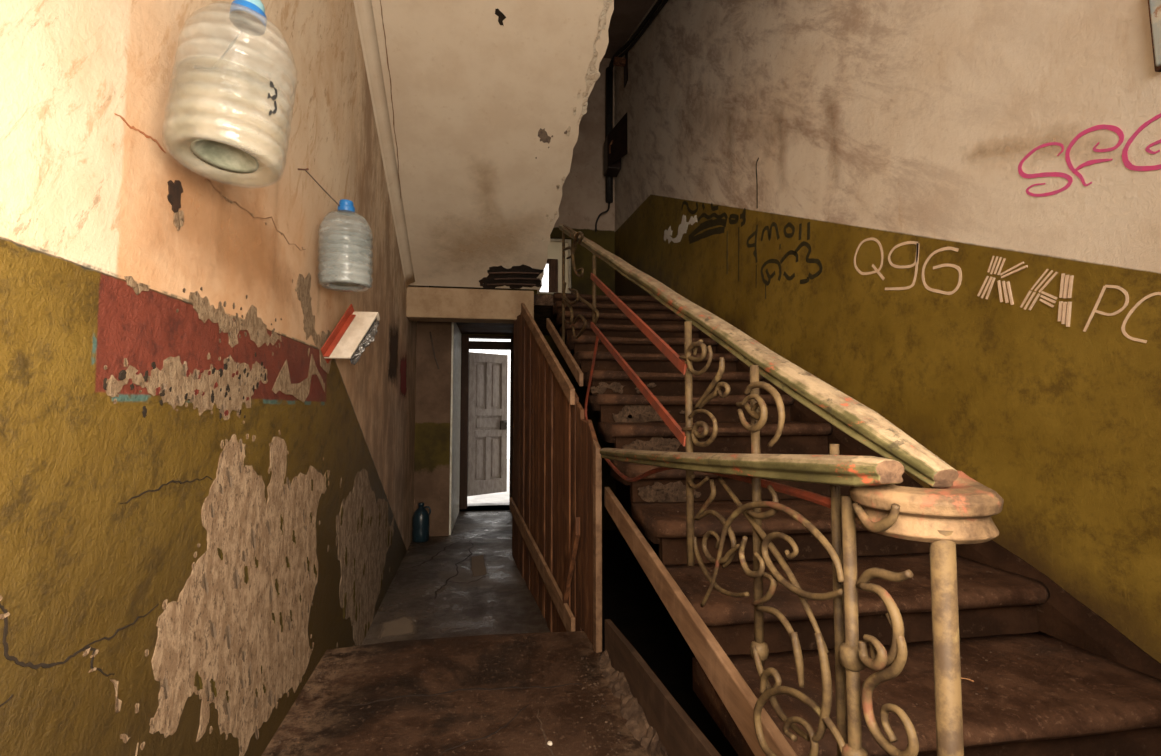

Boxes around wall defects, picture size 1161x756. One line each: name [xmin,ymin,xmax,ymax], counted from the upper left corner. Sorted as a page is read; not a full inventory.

crack [114,113,166,153]
peeling [173,210,184,231]
crack [205,179,305,250]
crack [120,476,213,504]
peeling [103,273,394,756]
crack [0,595,159,676]